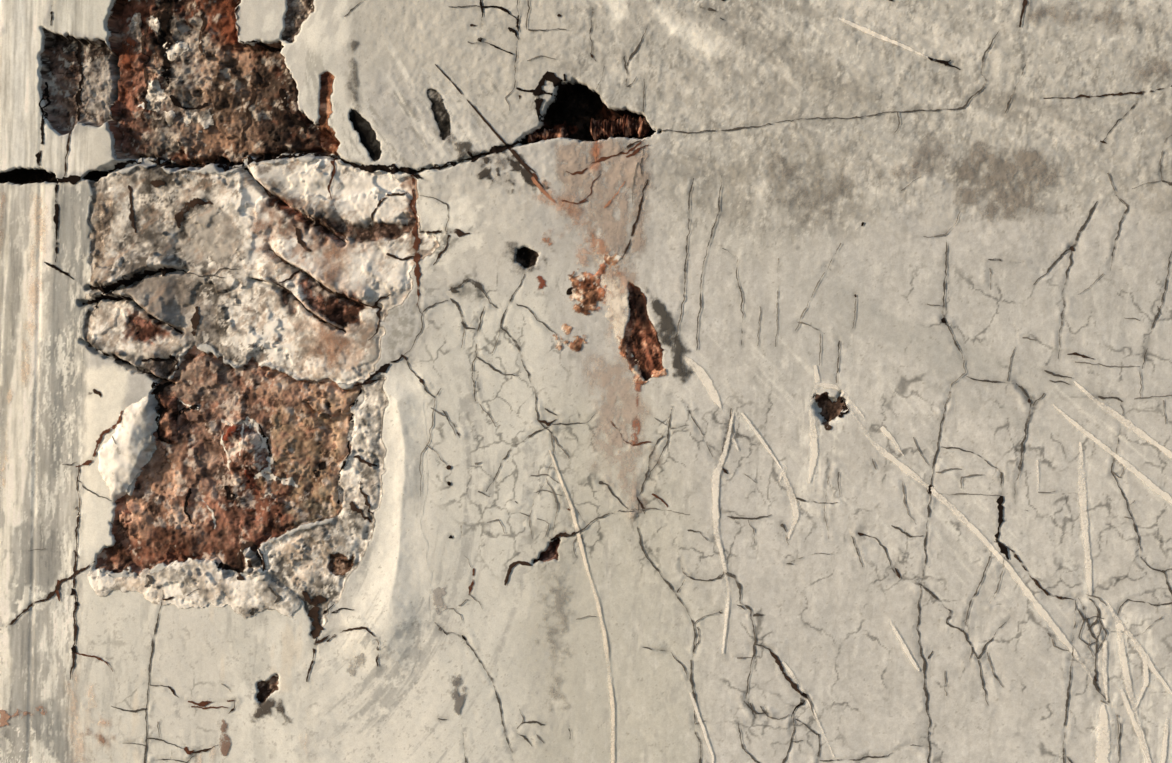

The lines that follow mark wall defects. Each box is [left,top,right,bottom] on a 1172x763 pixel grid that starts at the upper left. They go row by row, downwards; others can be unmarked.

crack [35,82,391,390]
flaking render [40,0,439,639]
rust [538,139,692,446]
crack [108,138,1172,763]
crack [449,0,1028,259]
hole [813,392,850,430]
crack [1044,86,1172,144]